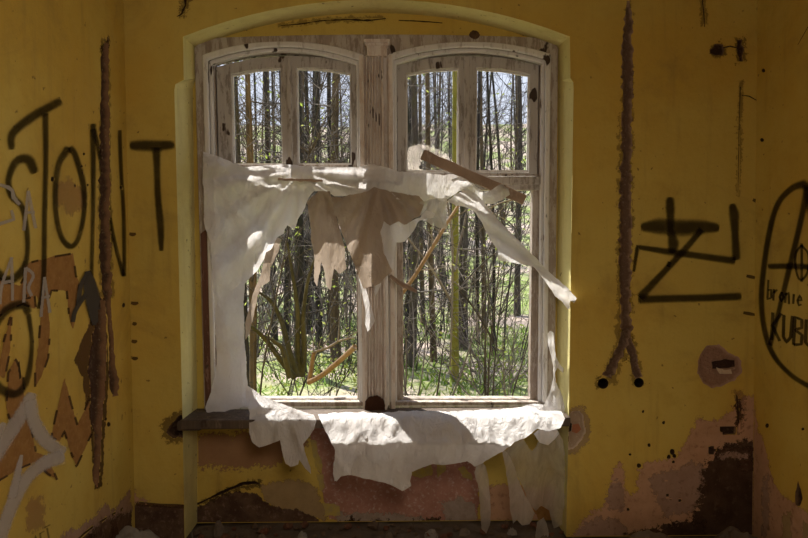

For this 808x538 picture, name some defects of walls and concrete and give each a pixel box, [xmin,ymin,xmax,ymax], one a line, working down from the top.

crack [177,0,193,18]
crack [281,18,442,26]
flaking render [697,344,742,388]
peeling [197,429,283,472]
flaking render [260,428,480,521]
peeling [568,395,808,538]
peeling [60,490,133,538]
peeling [489,483,512,520]